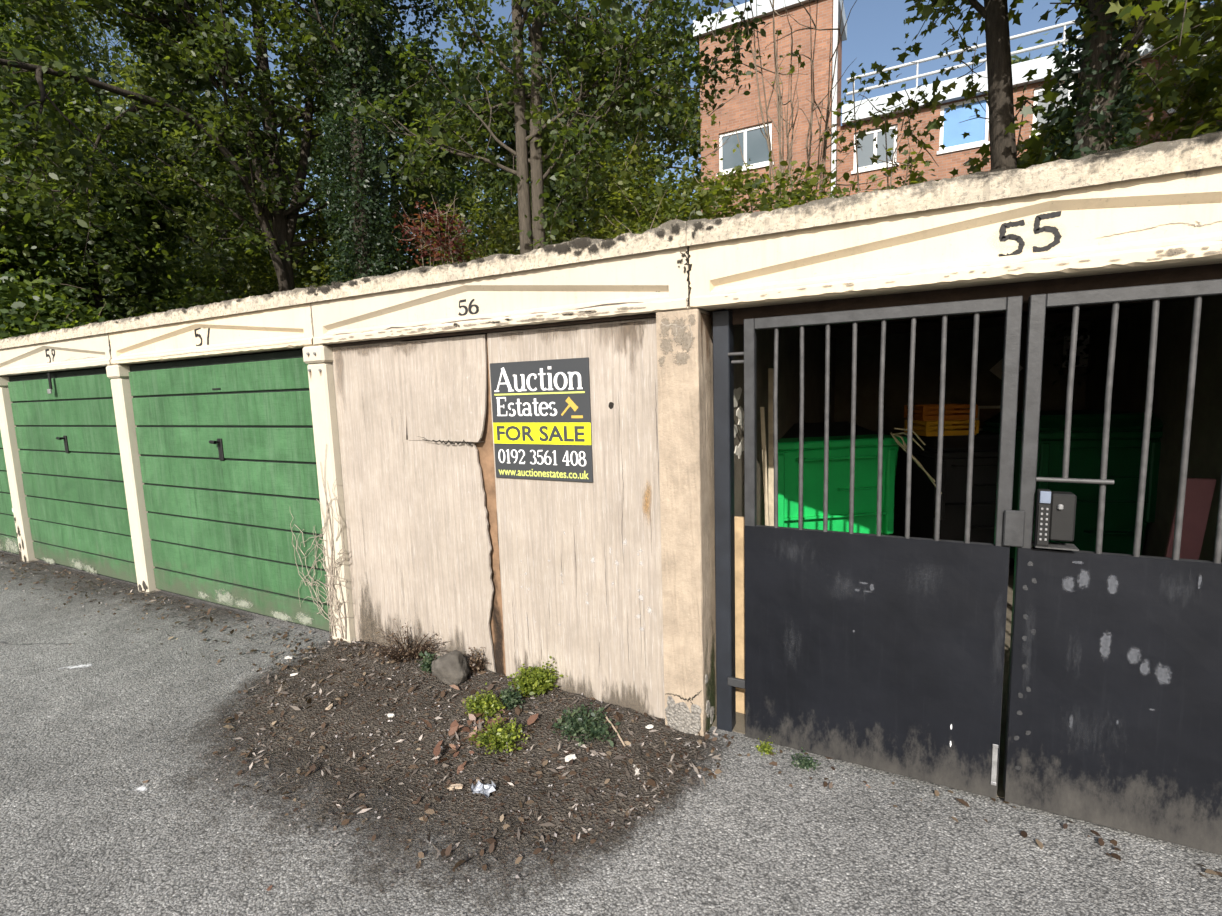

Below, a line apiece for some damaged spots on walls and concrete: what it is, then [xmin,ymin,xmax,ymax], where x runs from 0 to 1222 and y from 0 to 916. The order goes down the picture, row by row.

peeling [1147,247,1222,260]
crack [61,247,693,362]
crack [361,390,472,464]